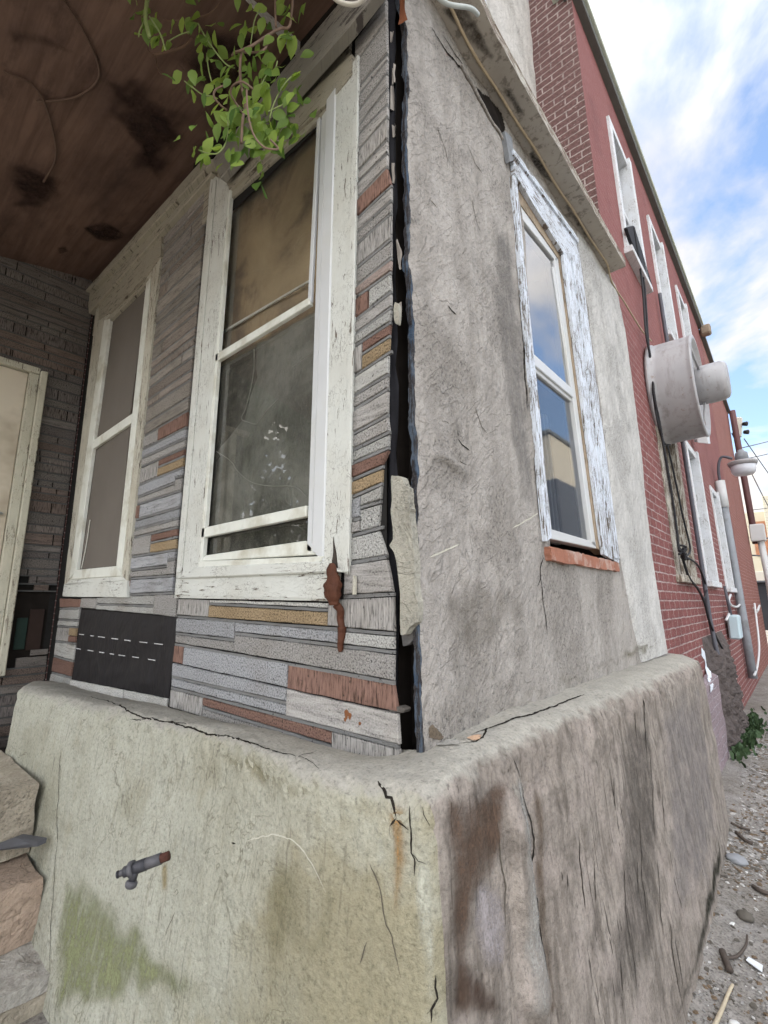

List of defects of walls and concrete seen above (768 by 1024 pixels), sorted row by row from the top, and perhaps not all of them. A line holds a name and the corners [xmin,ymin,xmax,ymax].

water stain [116,85,176,170]
corrosion [323,563,347,652]
crack [91,696,318,768]
crack [464,694,584,743]
crack [378,781,429,874]
water stain [621,735,653,951]
water stain [60,892,176,1001]
crack [360,865,401,977]
water stain [451,786,505,1009]
water stain [519,783,554,1009]
water stain [698,853,720,952]
crack [427,976,439,1022]